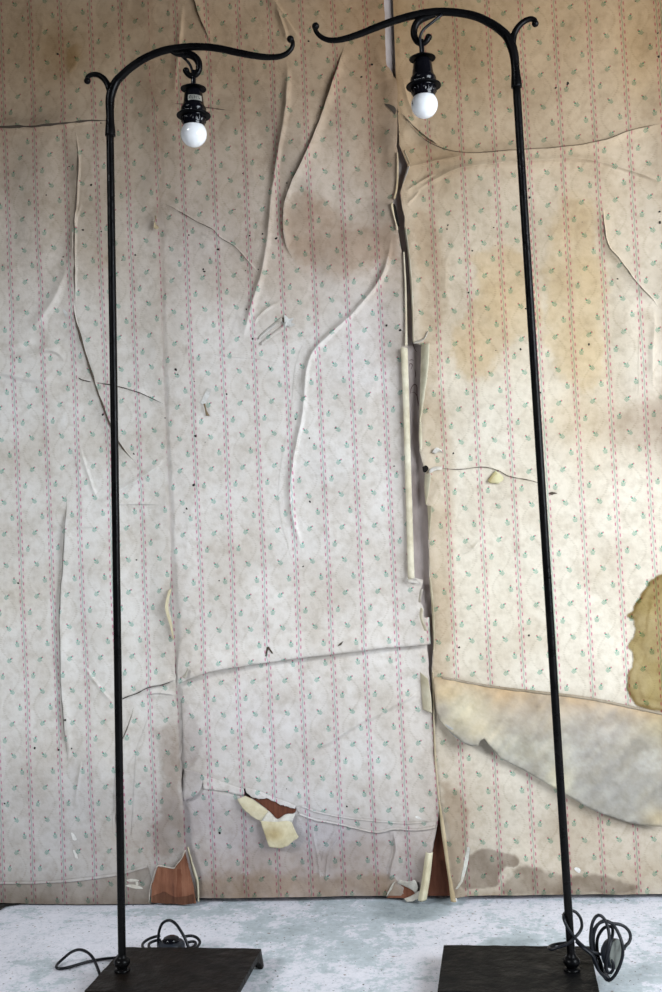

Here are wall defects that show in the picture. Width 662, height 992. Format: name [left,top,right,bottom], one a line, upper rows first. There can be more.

peeling [391,150,443,651]
leakage [612,389,662,466]
leakage [626,574,662,712]
peeling [126,847,199,905]
spalling [238,789,299,848]
peeling [249,672,662,982]